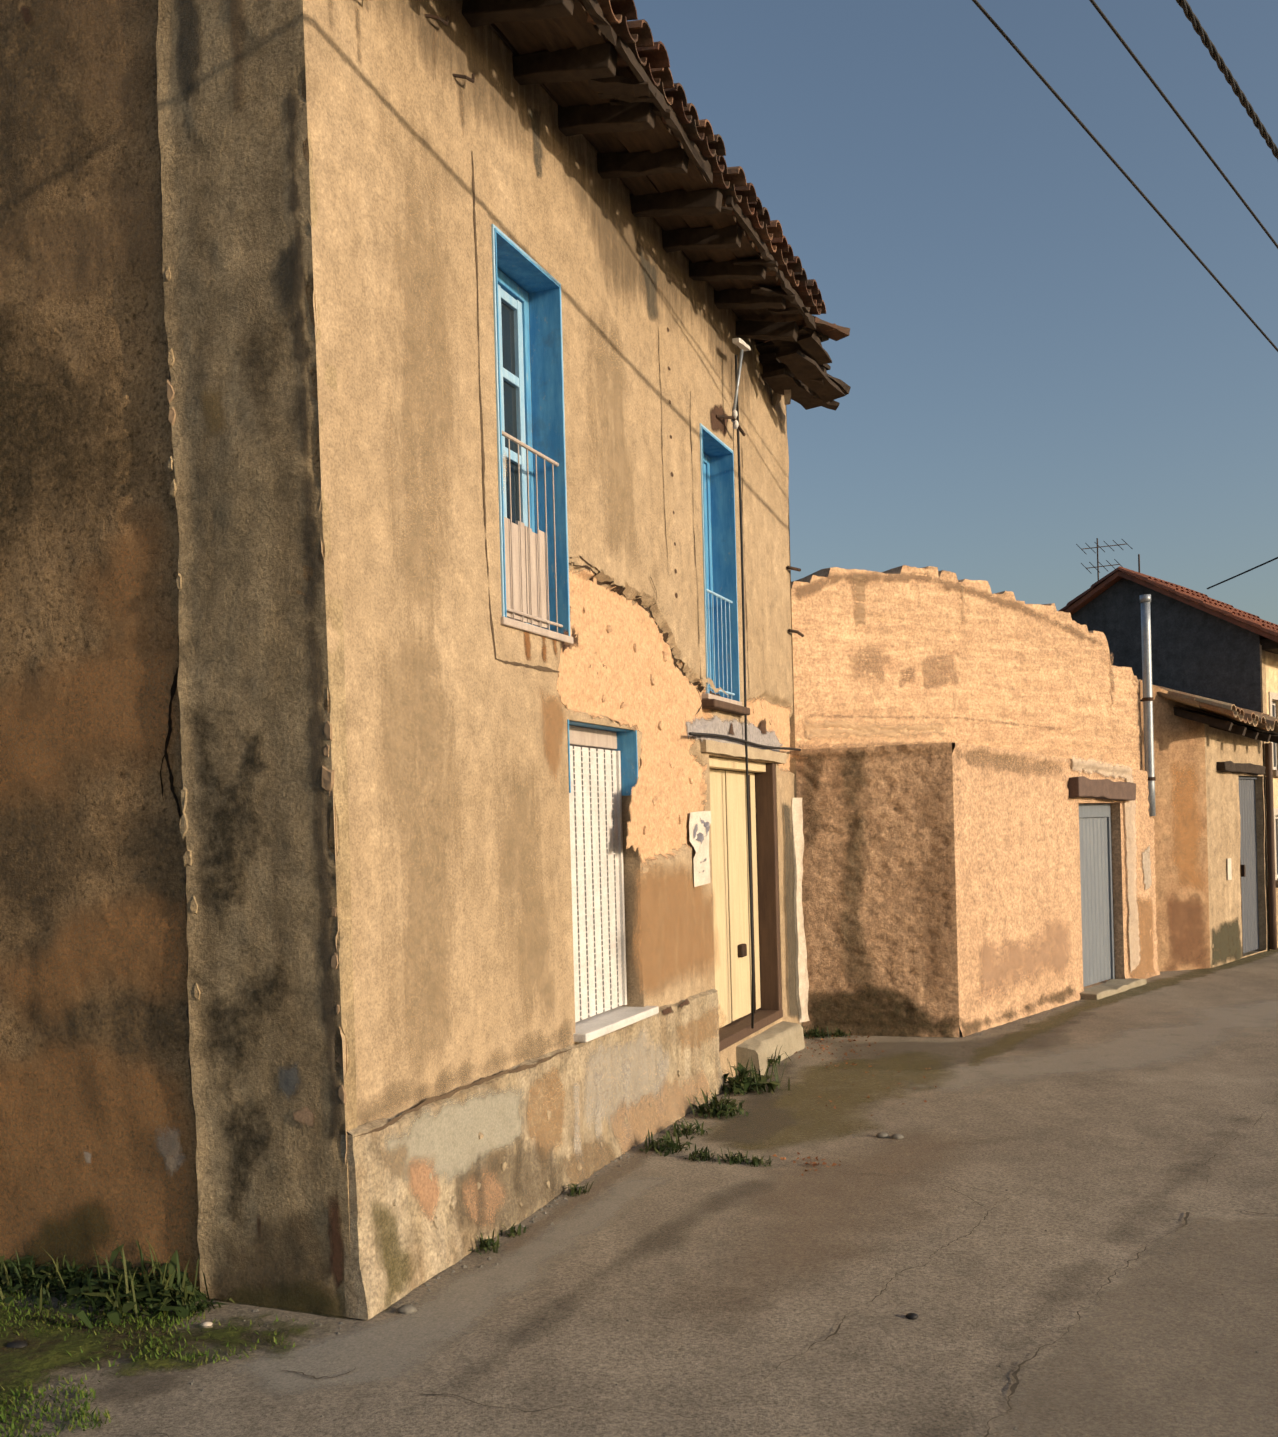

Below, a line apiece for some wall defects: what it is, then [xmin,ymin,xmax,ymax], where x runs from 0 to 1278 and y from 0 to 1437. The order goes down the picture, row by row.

leakage [178,0,200,96]
crack [157,124,171,281]
leakage [276,93,309,367]
crack [165,327,177,504]
crack [175,573,183,590]
crack [160,637,201,1123]
leakage [305,477,343,1137]
spalling [557,568,717,863]
spalling [729,698,791,771]
leakage [784,752,1073,1038]
peeling [409,1161,523,1229]
peeling [567,1070,711,1185]